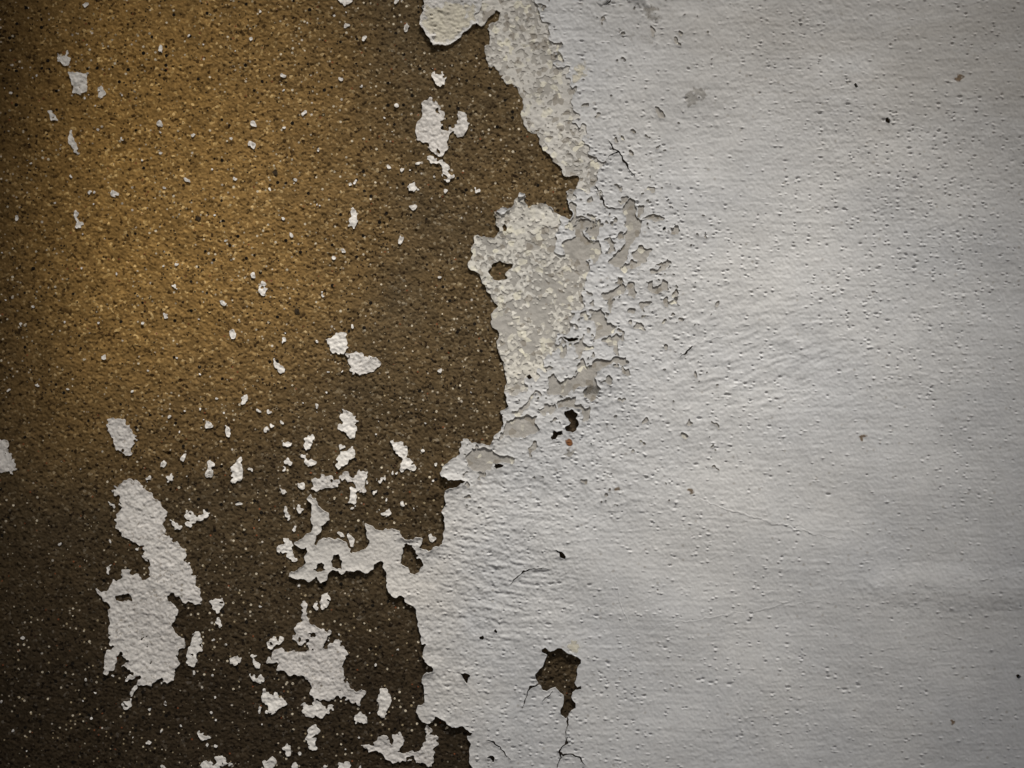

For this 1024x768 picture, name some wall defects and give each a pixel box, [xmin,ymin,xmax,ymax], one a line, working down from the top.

peeling [0,0,696,768]
crack [557,737,582,767]